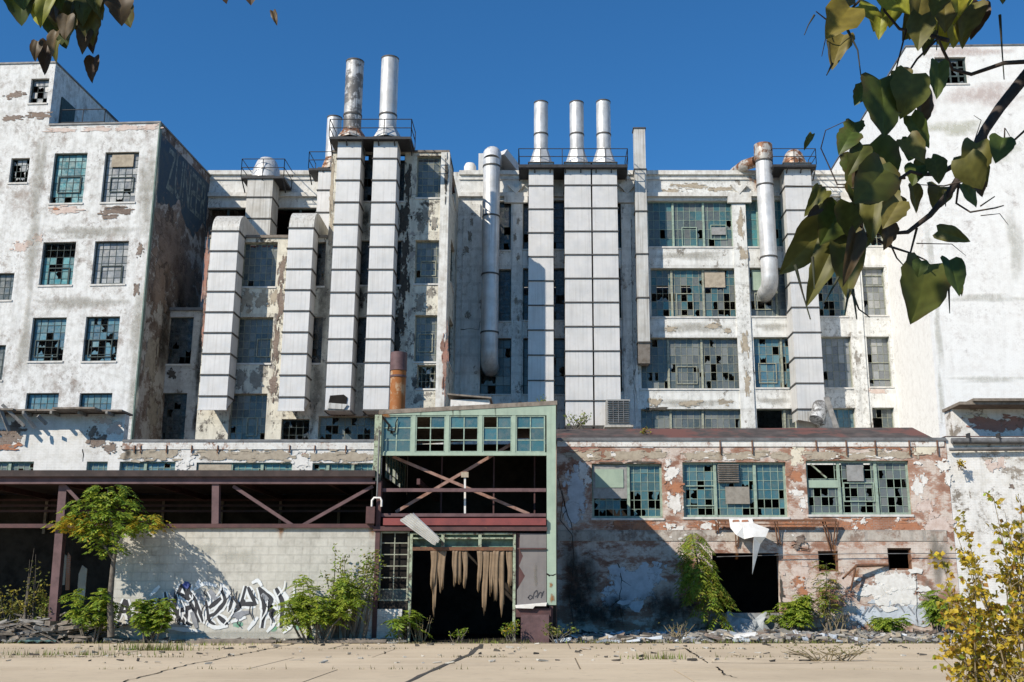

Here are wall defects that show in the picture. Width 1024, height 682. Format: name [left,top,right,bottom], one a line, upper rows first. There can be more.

peeling [98,206,134,219]
leakage [319,269,328,331]
spalling [0,420,27,450]
spalling [85,417,373,470]
peeling [961,414,1024,433]
peeling [562,443,956,612]
leakage [566,555,625,627]
leakage [649,592,695,624]
peeling [837,566,936,628]